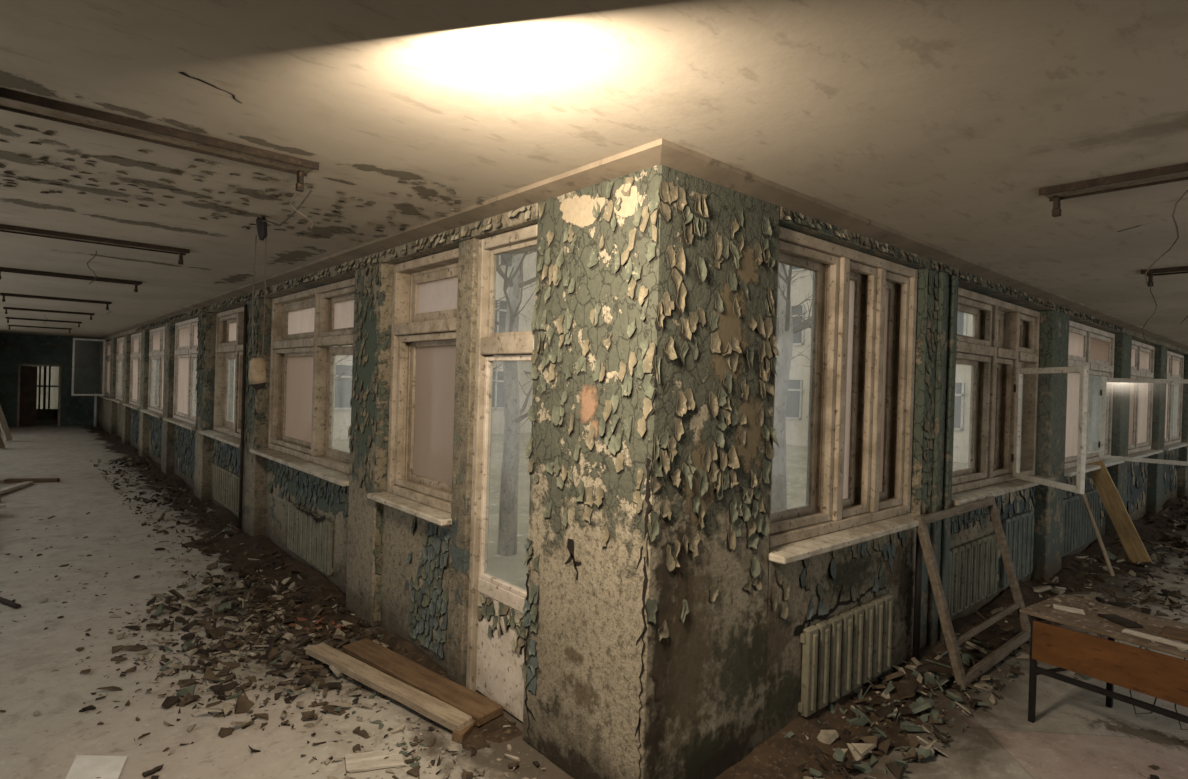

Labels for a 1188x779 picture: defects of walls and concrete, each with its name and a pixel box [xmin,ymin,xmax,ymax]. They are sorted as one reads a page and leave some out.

peeling [0,71,57,98]
peeling [95,102,206,133]
spalling [0,125,939,623]
peeling [406,517,451,660]
peeling [477,538,540,696]
peeling [645,598,689,641]